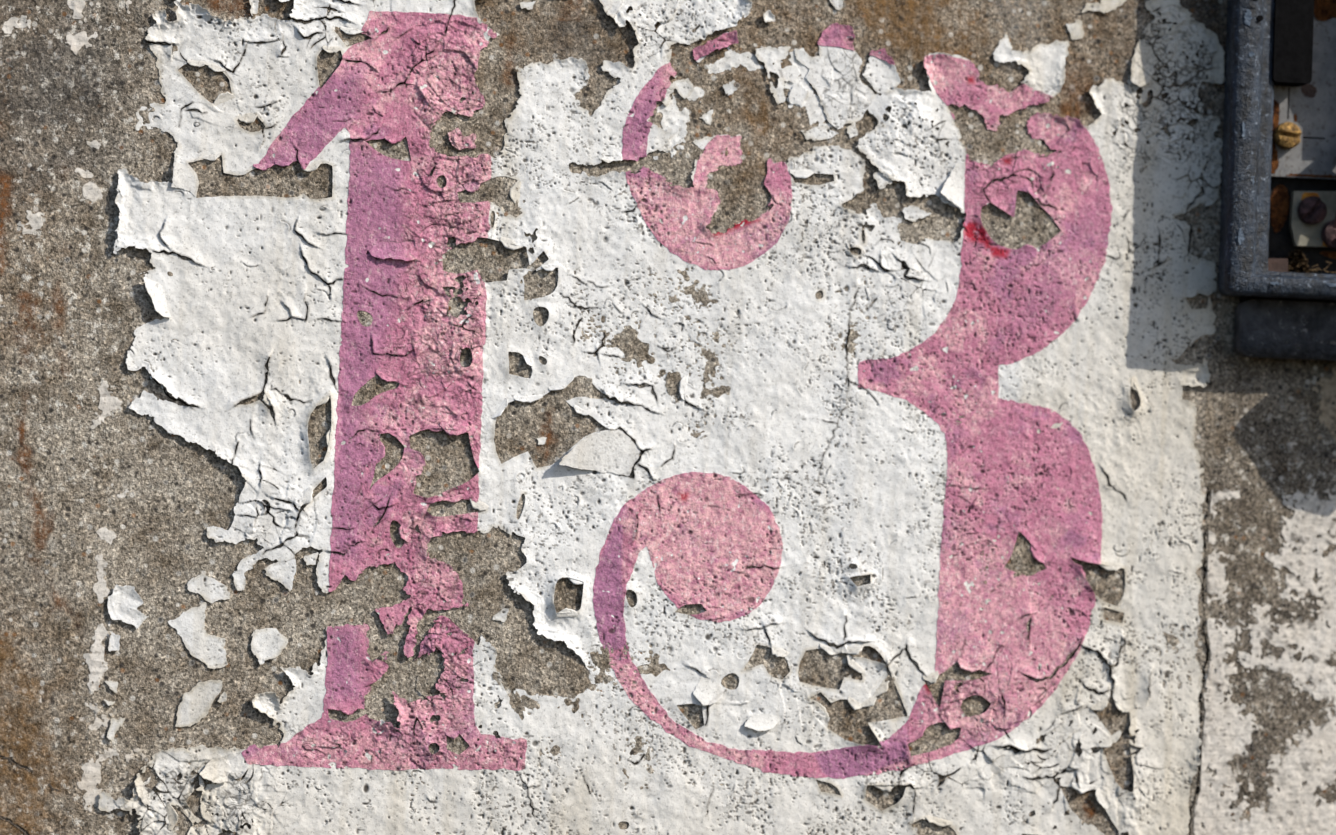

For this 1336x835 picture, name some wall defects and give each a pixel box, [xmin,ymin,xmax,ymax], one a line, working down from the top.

crack [215,0,358,73]
crack [340,0,456,93]
peeling [755,36,900,141]
peeling [188,152,333,200]
peeling [437,175,558,326]
peeling [492,373,611,468]
peeling [107,585,149,651]
peeling [168,572,230,727]
peeling [721,641,907,746]
peeling [1091,683,1134,792]
crack [1188,341,1230,835]
peeling [1198,335,1336,821]